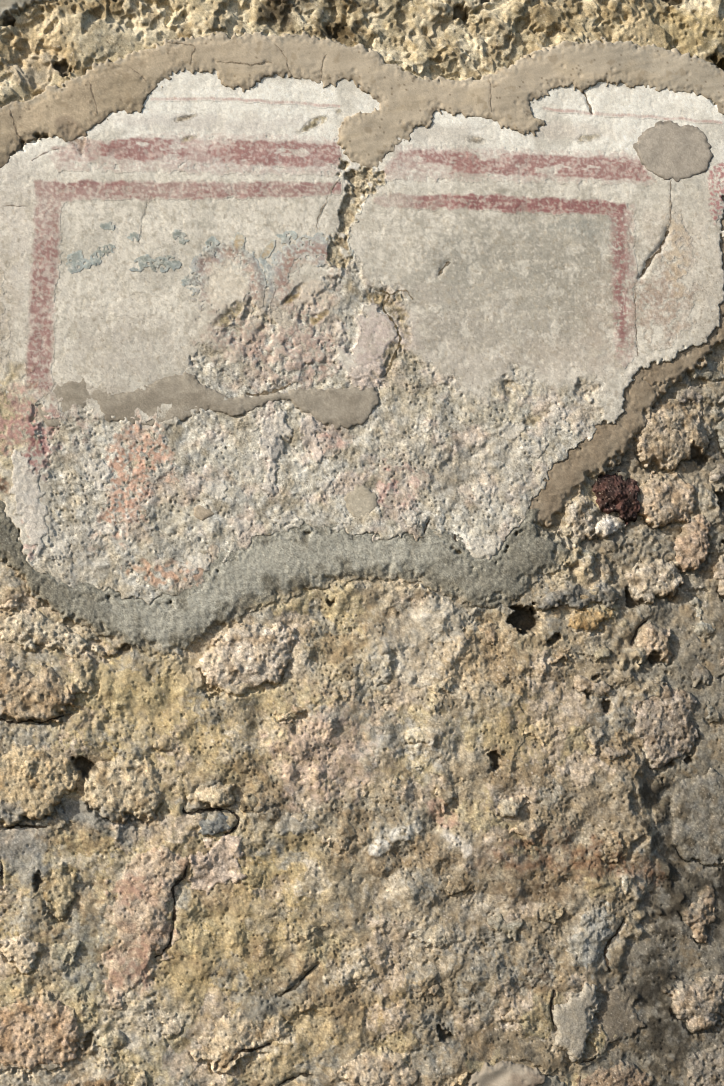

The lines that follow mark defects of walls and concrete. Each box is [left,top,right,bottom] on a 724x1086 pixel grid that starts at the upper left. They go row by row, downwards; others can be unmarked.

crack [634,181,672,356]
peeling [275,812,319,836]
peeling [97,829,246,1011]
crack [154,865,191,958]
peeling [566,899,620,972]
crack [604,919,624,972]